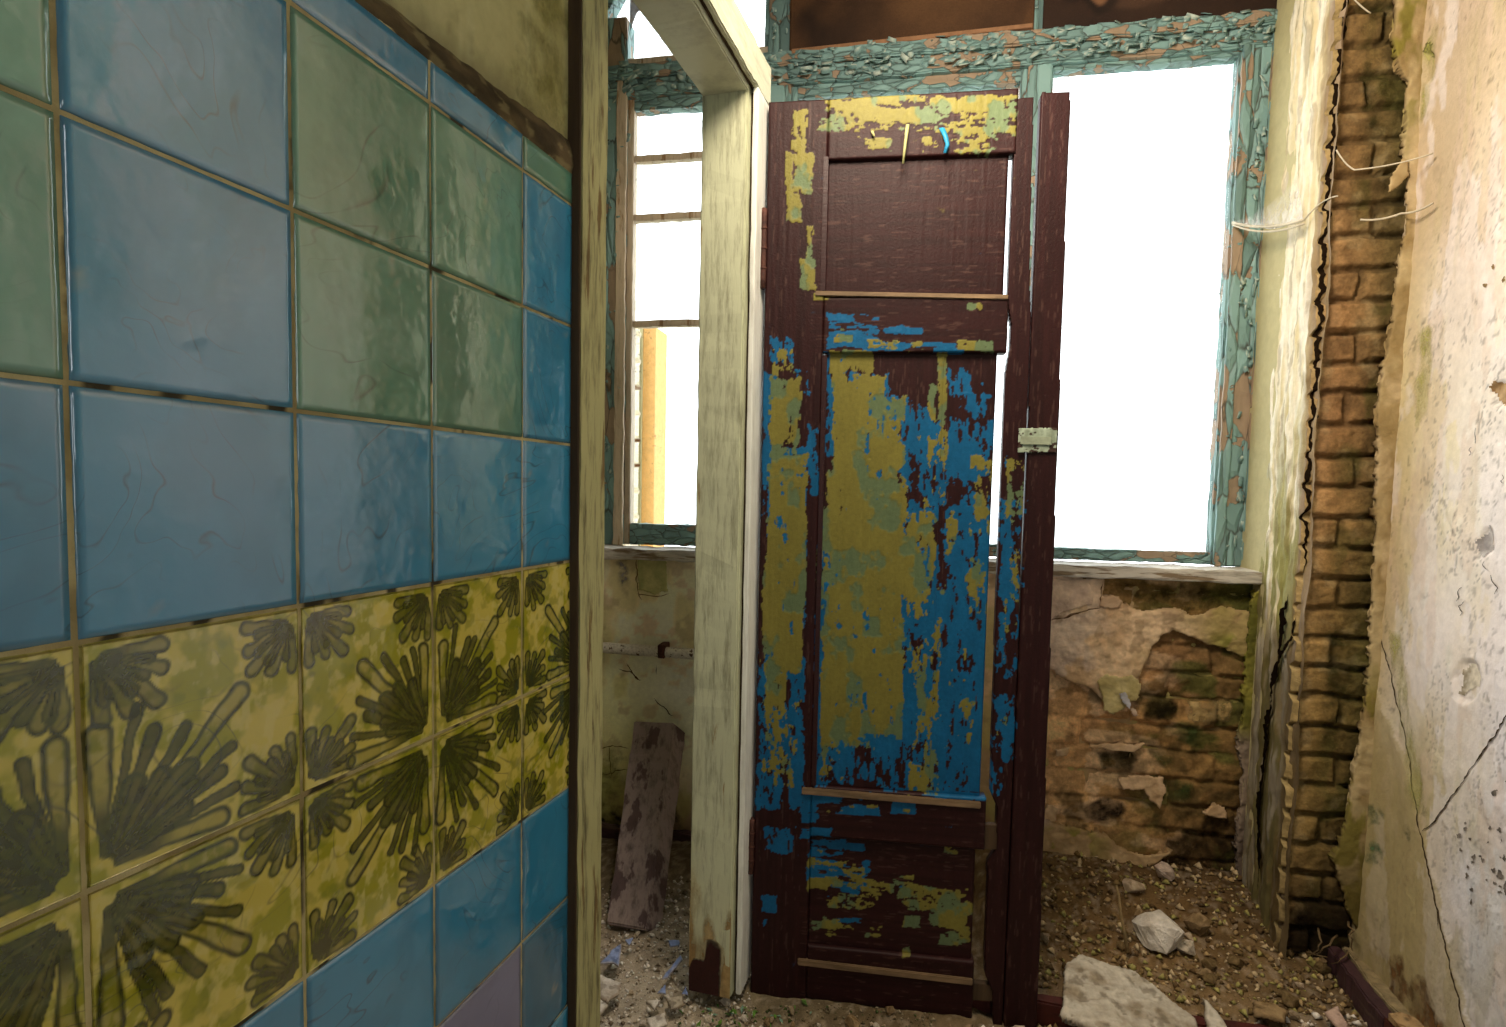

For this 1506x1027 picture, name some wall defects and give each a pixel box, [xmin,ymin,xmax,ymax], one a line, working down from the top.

peeling [762,7,1276,84]
spalling [1274,0,1435,955]
spalling [1043,576,1259,876]